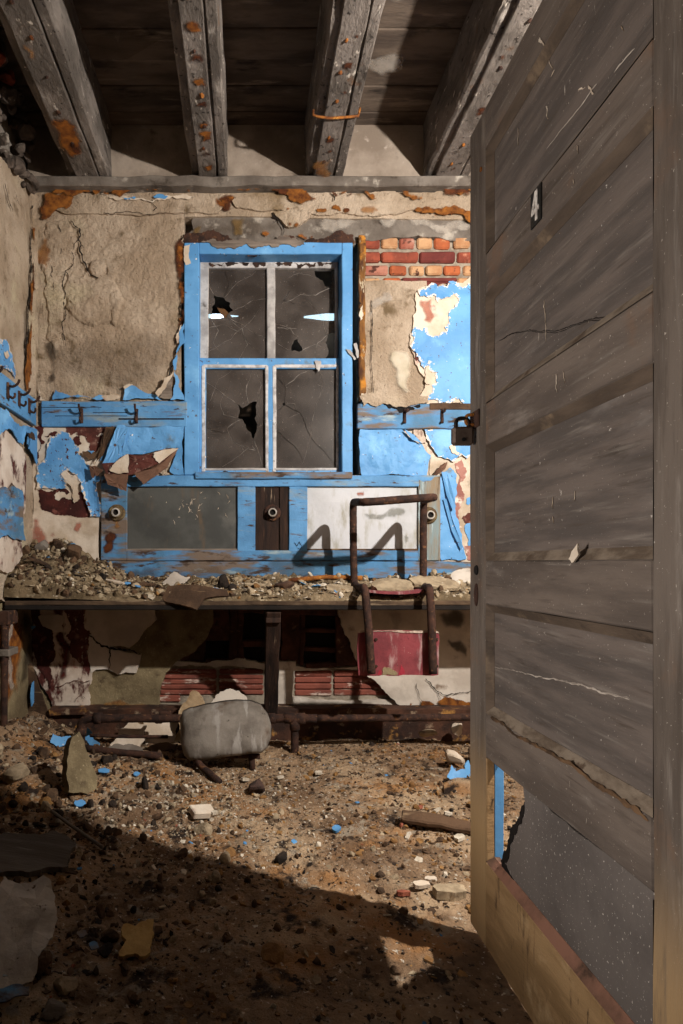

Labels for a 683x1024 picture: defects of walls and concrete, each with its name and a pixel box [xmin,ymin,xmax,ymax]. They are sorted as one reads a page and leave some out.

corrosion [51,119,81,157]
peeling [0,339,16,379]
crack [5,185,98,367]
spalling [38,191,470,404]
crack [499,307,629,341]
peeling [0,408,184,573]
peeling [359,429,470,562]
crack [496,667,630,700]